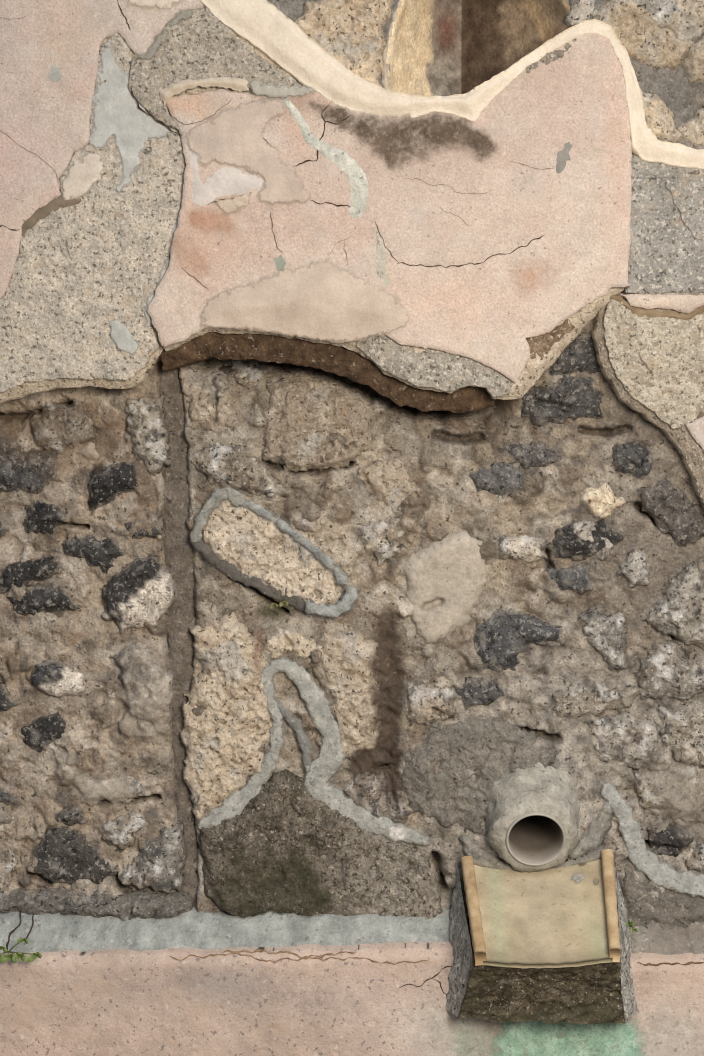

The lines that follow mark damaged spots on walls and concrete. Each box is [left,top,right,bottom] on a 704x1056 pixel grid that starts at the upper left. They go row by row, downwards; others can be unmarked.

flaking render [0,0,513,413]
crack [283,97,545,287]
flaking render [603,296,704,429]
leakage [351,615,404,806]
crack [169,949,451,995]
leakage [446,1020,642,1056]
crack [638,959,704,967]